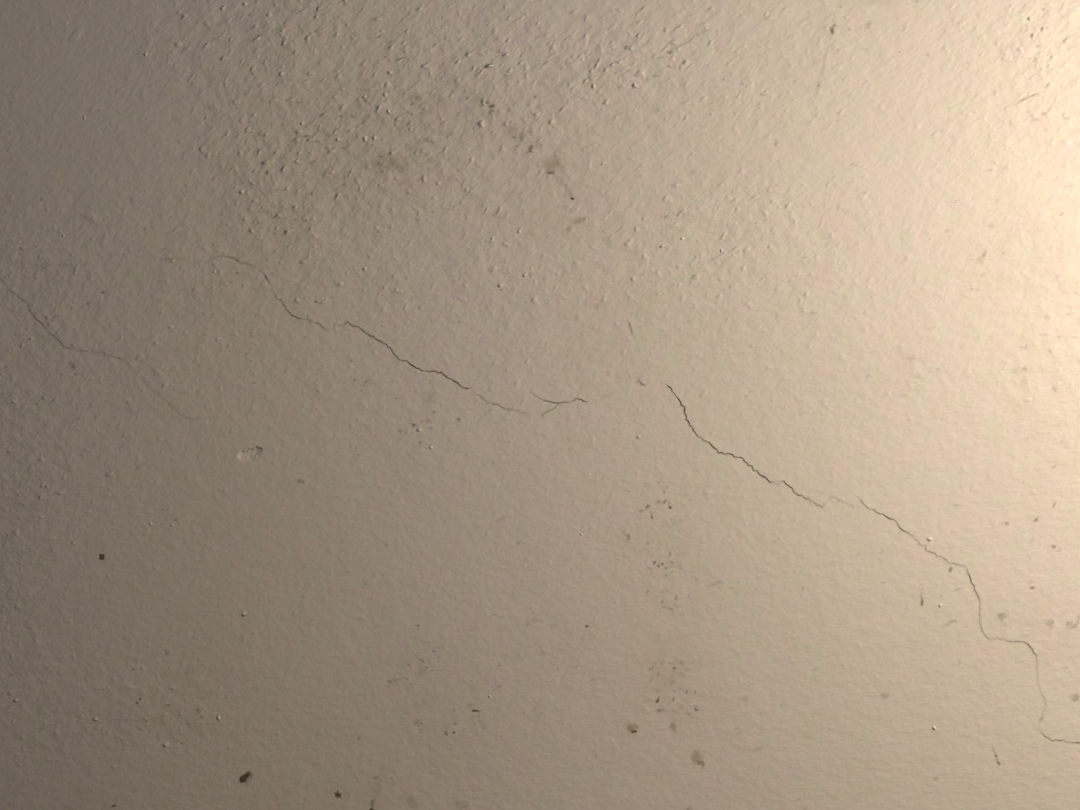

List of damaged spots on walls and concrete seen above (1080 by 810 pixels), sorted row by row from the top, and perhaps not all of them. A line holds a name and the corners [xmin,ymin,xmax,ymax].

crack [667,385,1037,658]